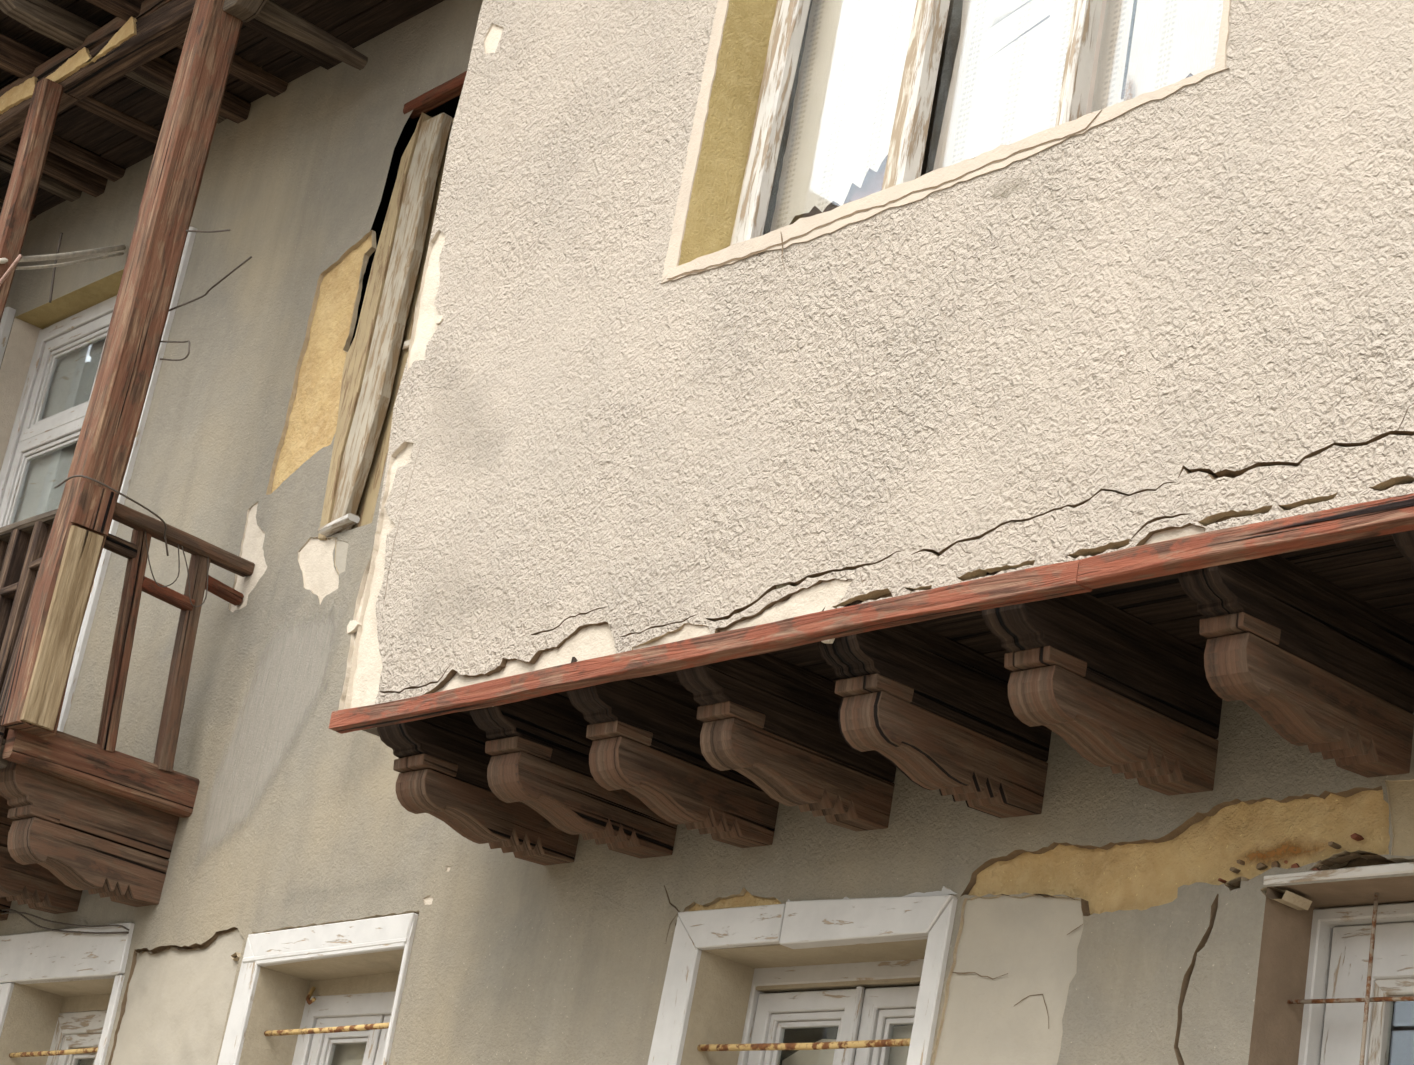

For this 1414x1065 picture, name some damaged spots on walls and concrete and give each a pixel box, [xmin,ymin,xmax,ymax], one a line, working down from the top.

flaking render [407,230,445,370]
flaking render [229,230,377,612]
flaking render [338,442,414,710]
crack [380,663,452,694]
crack [531,404,1414,637]
crack [135,927,237,954]
flaking render [931,779,1414,1065]
crack [1174,894,1219,1065]